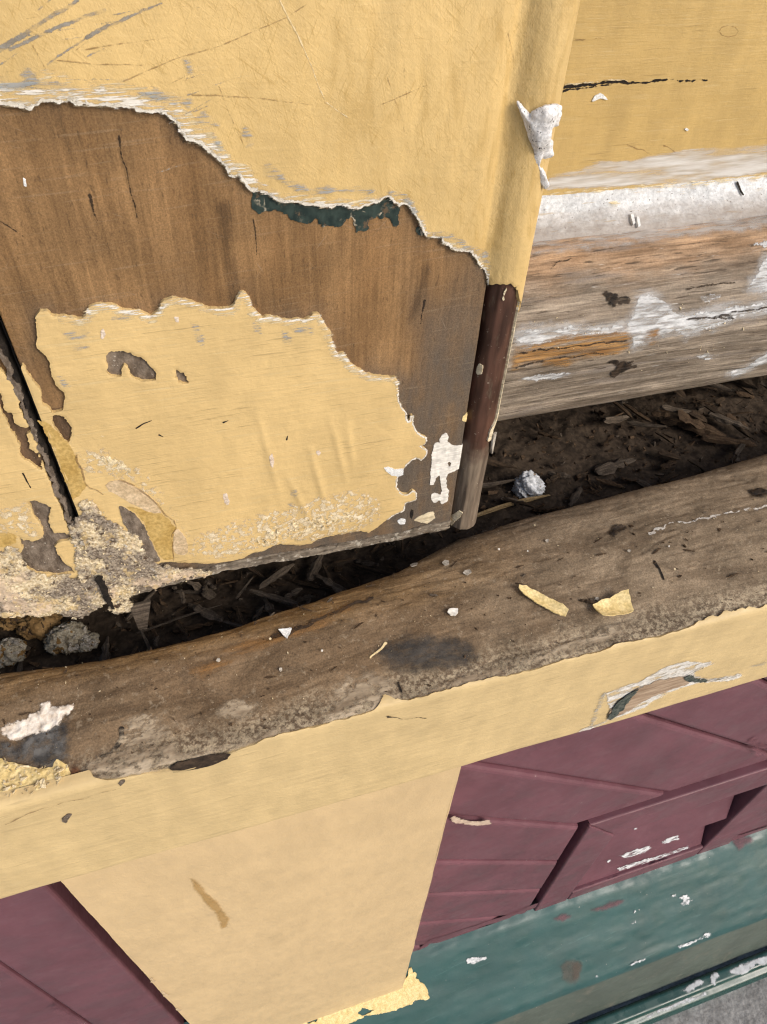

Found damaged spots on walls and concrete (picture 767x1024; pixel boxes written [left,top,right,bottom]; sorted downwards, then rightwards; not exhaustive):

peeling [0,70,490,620]